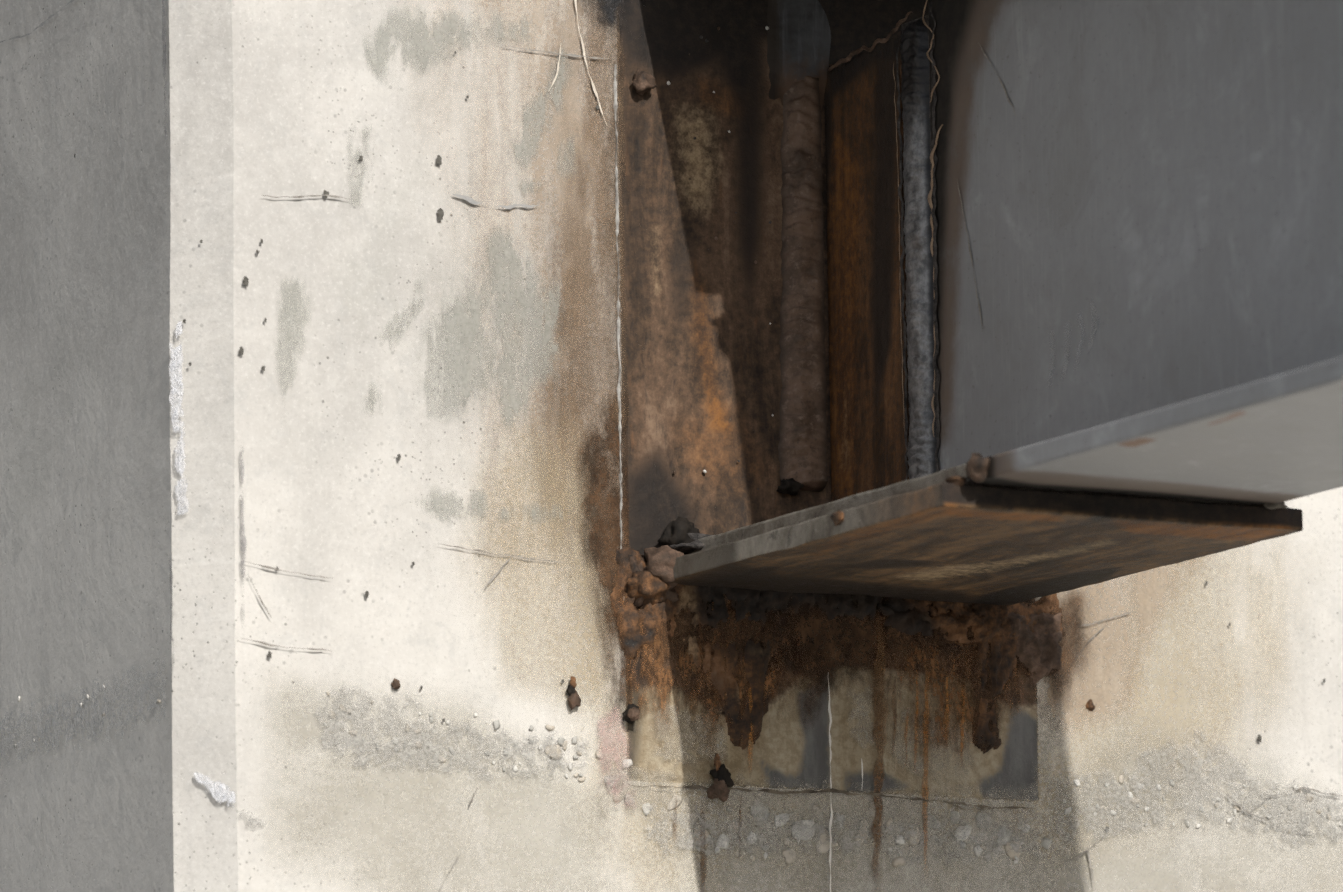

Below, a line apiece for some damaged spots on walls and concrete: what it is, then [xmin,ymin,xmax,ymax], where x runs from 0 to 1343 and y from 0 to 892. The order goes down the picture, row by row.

water stain [485,0,608,528]
rust [544,97,1167,874]